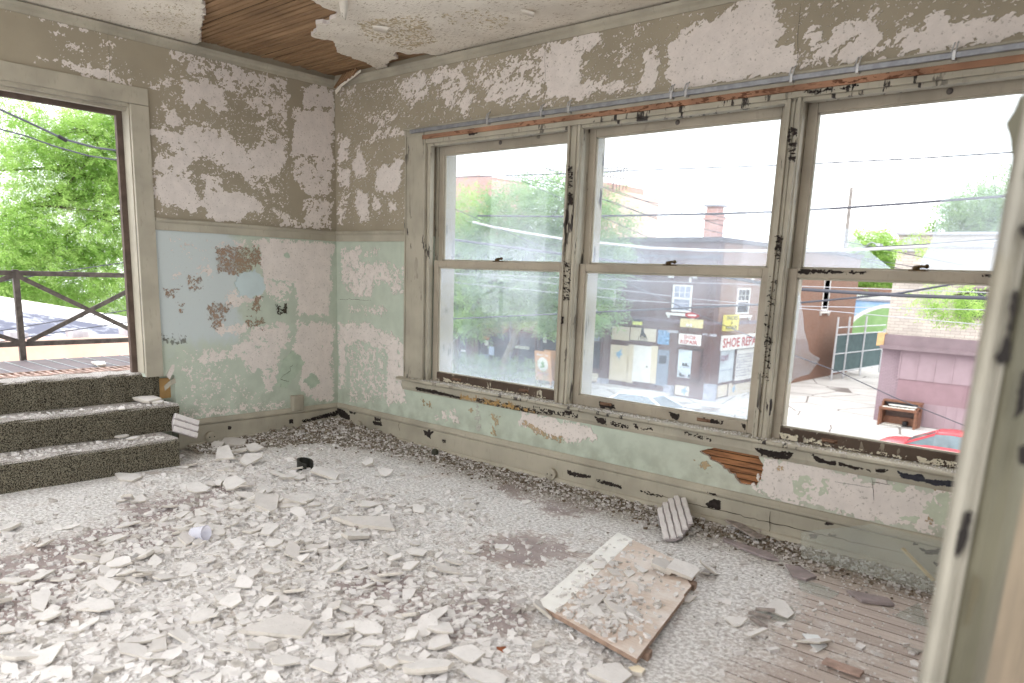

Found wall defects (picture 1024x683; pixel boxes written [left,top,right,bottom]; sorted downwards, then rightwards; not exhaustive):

peeling [29,0,1024,444]
peeling [684,432,957,567]